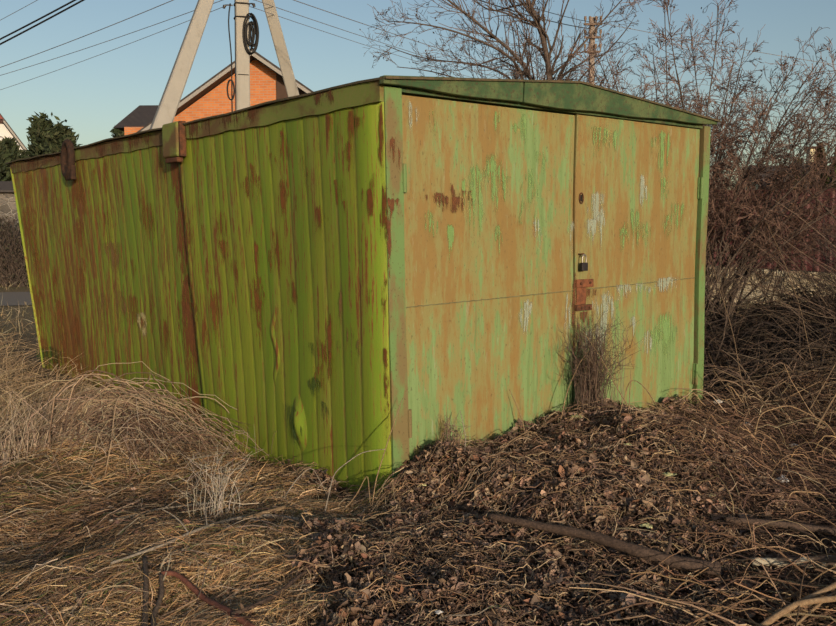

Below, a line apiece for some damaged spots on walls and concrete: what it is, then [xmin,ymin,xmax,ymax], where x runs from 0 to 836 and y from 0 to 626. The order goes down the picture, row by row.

rust [184,108,259,139]
rust [378,104,400,171]
rust [10,153,61,325]
rust [92,134,219,422]
rust [250,230,282,350]
rust [362,179,399,317]
rust [425,183,473,213]
rust [572,273,596,355]
peeling [587,191,605,241]
rust [383,348,391,441]